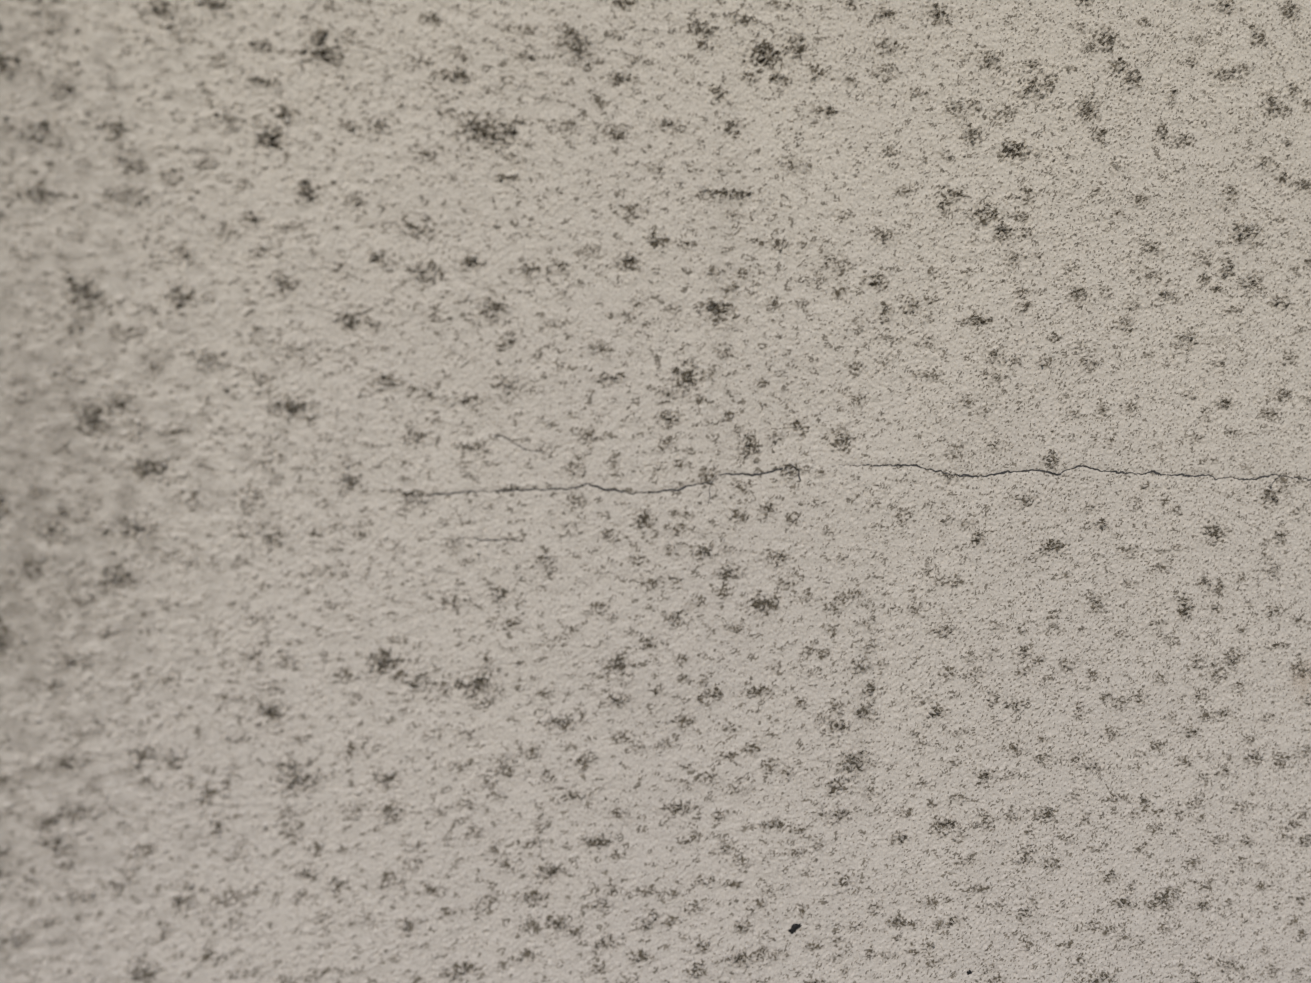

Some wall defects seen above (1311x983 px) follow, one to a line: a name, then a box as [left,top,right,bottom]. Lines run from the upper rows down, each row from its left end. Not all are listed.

crack [412,464,801,506]
crack [833,464,1310,494]